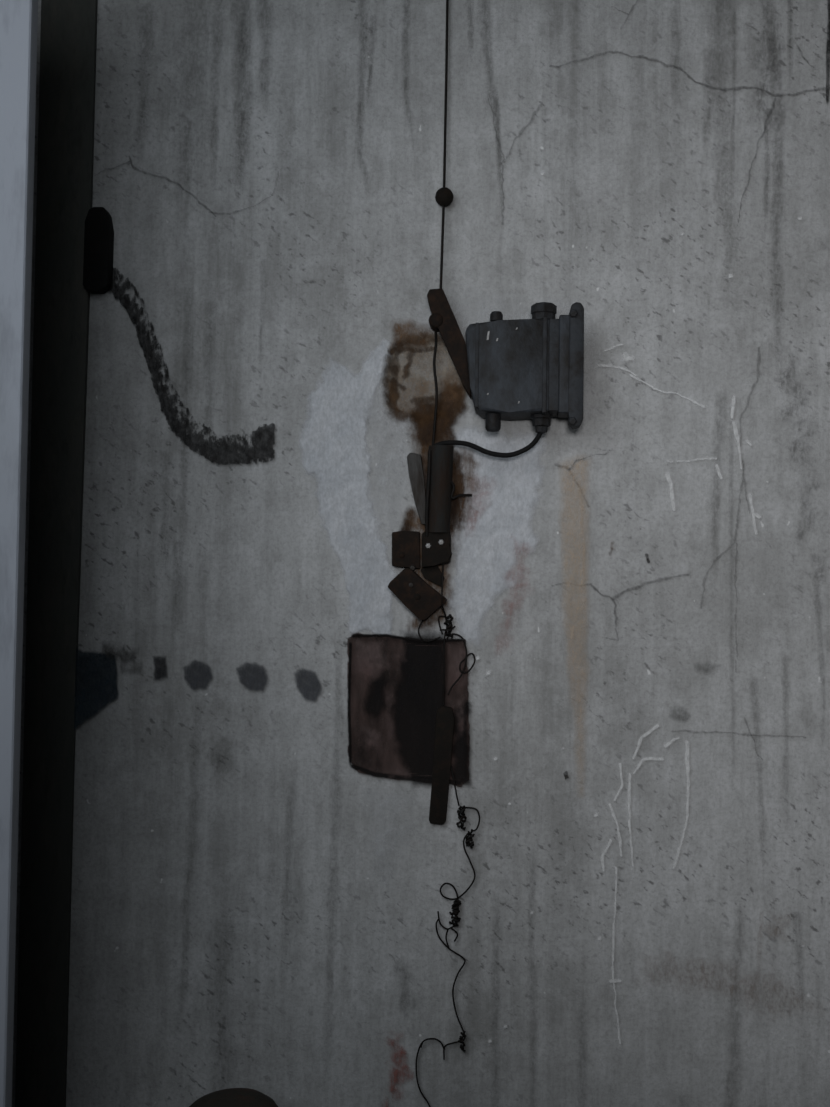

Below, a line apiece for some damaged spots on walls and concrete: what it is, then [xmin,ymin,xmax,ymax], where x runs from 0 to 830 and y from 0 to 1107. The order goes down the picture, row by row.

rust [395,375,475,531]
rust [347,509,470,787]